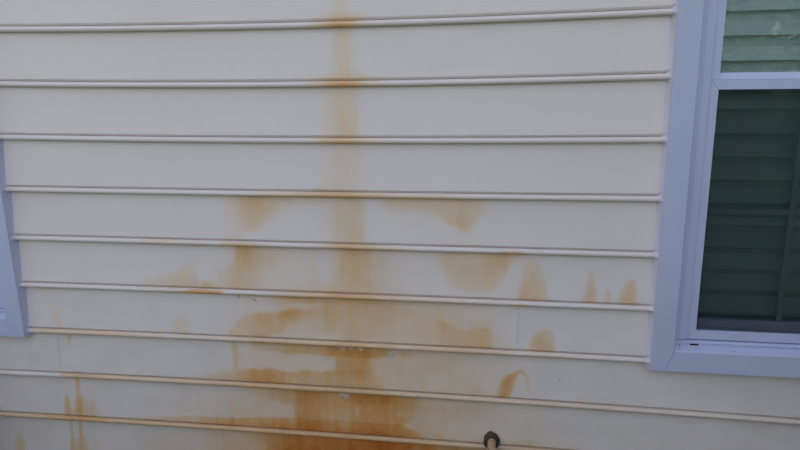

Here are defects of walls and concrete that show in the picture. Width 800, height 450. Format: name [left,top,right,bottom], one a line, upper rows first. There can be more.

corrosion [300,0,391,137]
corrosion [0,138,800,450]